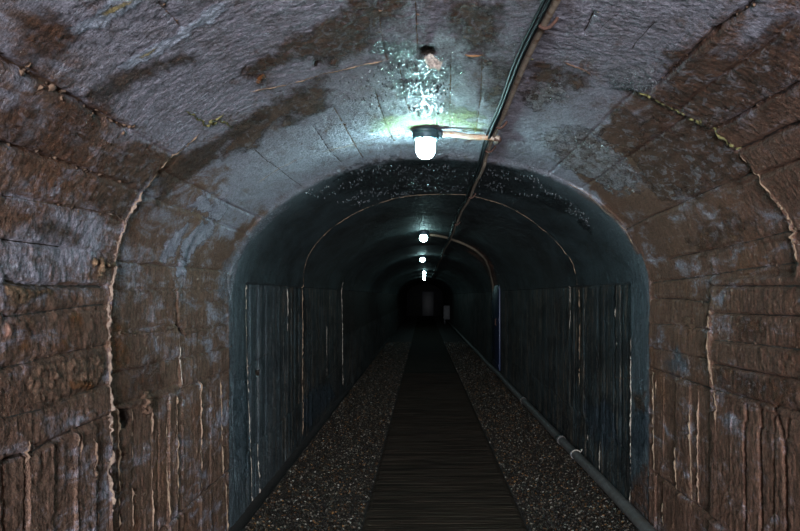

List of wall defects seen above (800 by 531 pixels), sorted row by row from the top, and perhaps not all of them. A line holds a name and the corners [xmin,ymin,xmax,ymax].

leakage [88,3,226,103]
spalling [419,45,443,73]
leakage [537,125,645,199]
crack [1,111,267,501]
crack [568,81,800,466]
crack [129,485,137,529]